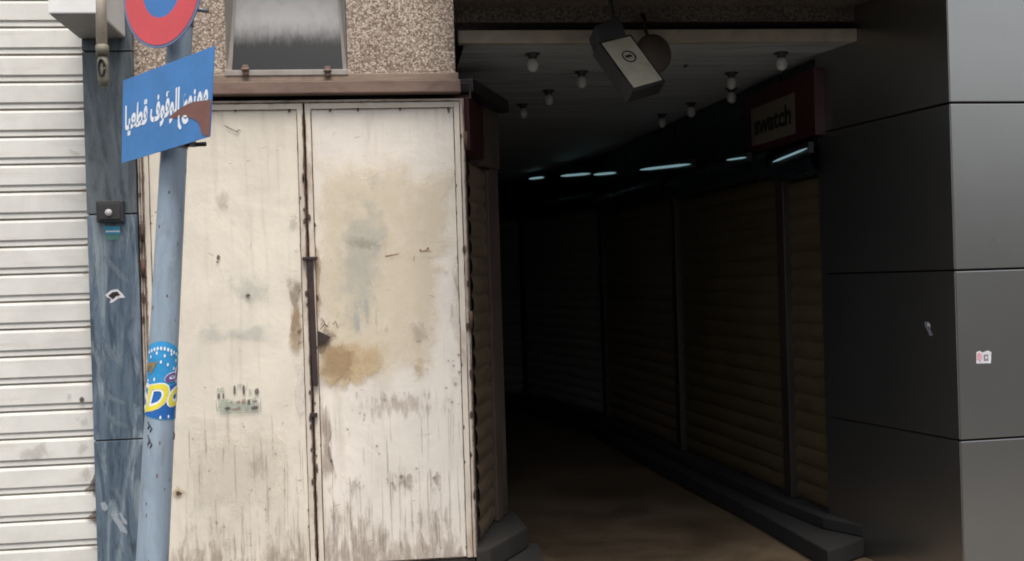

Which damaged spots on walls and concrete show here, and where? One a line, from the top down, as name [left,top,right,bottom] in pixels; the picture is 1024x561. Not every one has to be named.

corrosion [273,109,324,558]